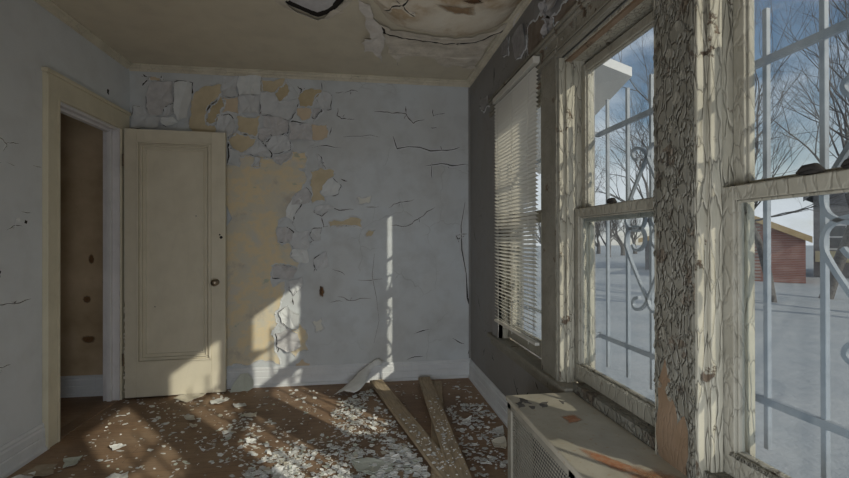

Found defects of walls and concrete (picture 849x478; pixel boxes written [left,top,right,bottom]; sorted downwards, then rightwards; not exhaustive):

leakage [440,0,482,15]
peeling [130,75,376,404]
crack [310,200,435,243]
crack [455,202,469,311]
peeling [652,0,694,352]
peeling [653,330,695,476]